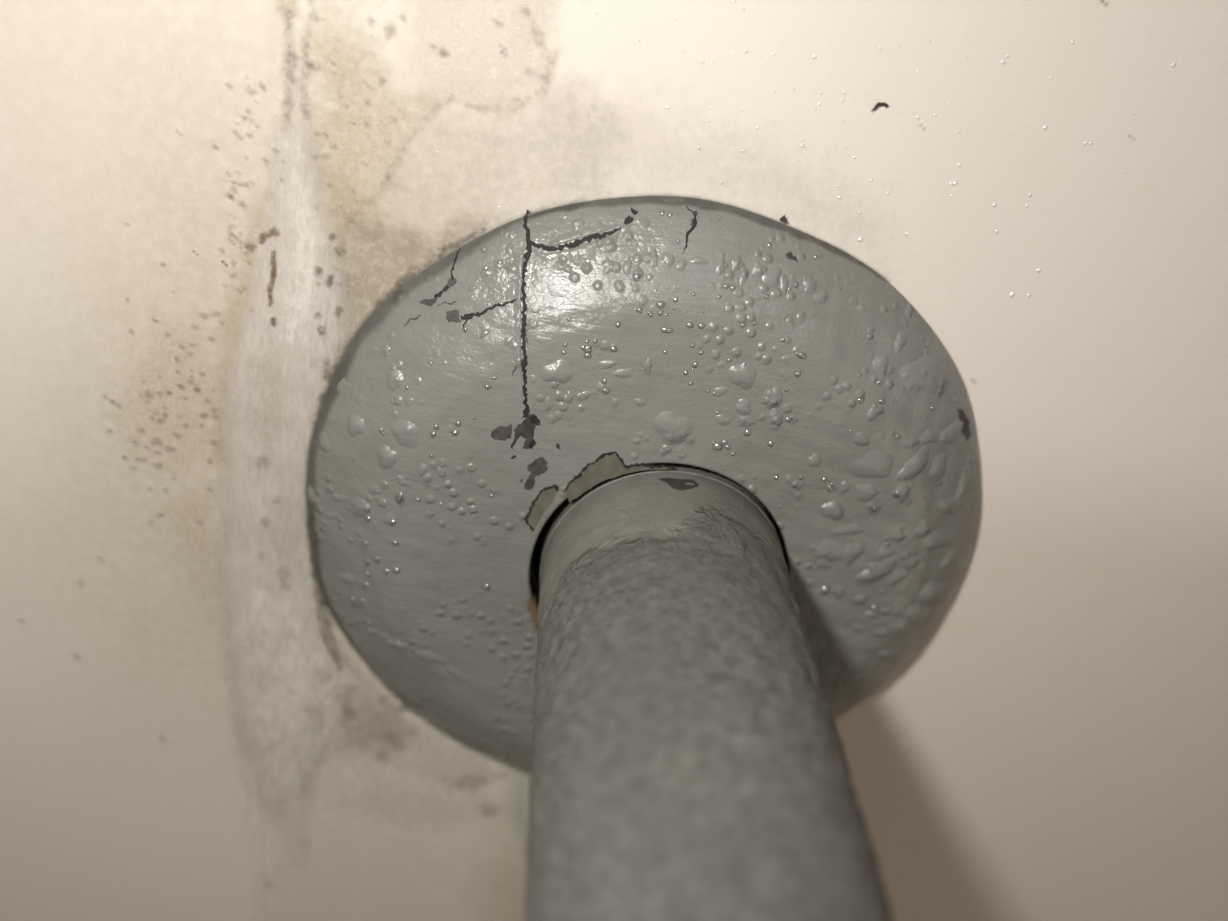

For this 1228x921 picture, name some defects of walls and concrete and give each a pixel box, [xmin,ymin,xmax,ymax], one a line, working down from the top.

leakage [314,234,462,424]
crack [404,208,638,418]
crack [683,206,698,253]
peeling [490,414,699,531]